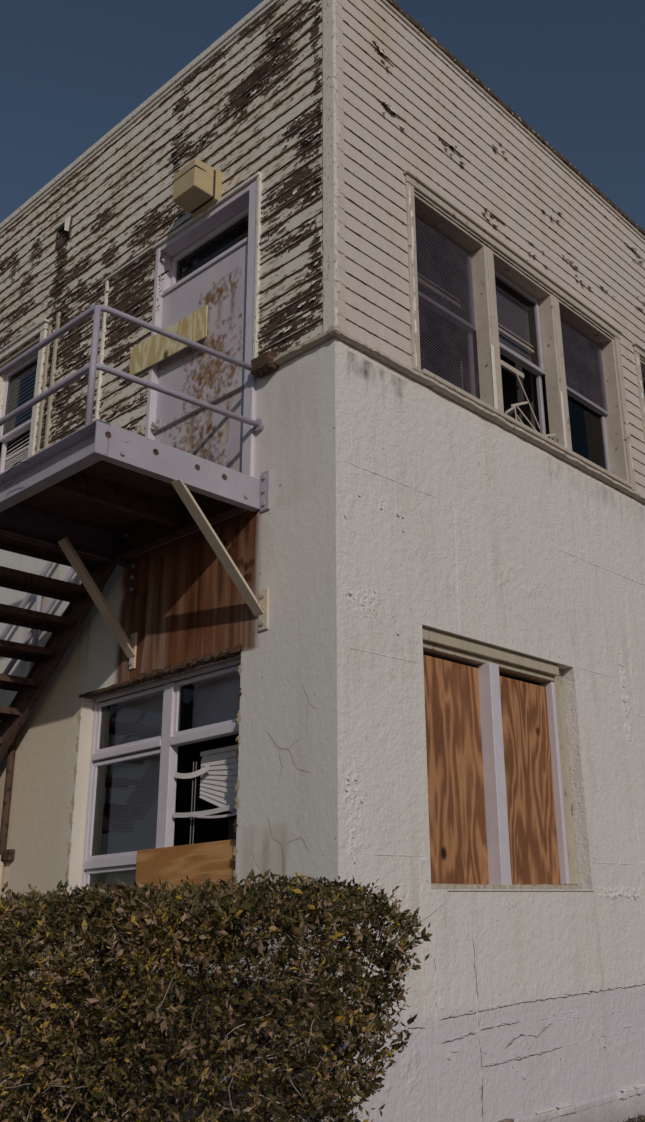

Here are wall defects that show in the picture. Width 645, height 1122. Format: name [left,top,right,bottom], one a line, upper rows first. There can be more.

peeling [165,0,322,356]
peeling [377,98,405,130]
peeling [438,135,466,166]
peeling [0,200,185,452]
rust [174,314,241,465]
rust [199,274,237,304]
crack [266,685,315,779]
crack [368,934,645,1120]